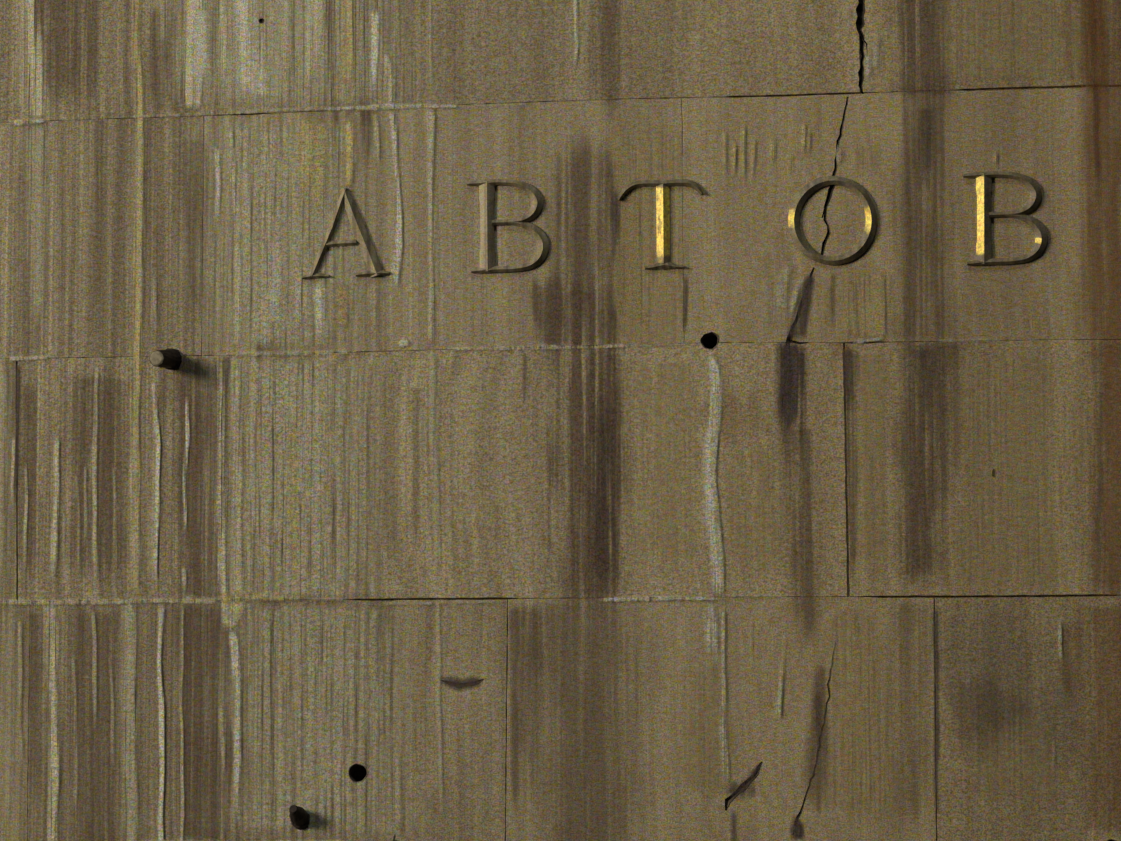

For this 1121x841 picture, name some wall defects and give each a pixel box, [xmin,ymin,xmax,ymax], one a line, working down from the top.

damp [3,0,456,841]
damp [453,127,759,794]
damp [774,267,813,618]
crack [786,0,868,347]
damp [831,273,889,403]
damp [901,0,956,576]
damp [437,611,478,781]
damp [790,818,803,839]
crack [792,644,835,835]